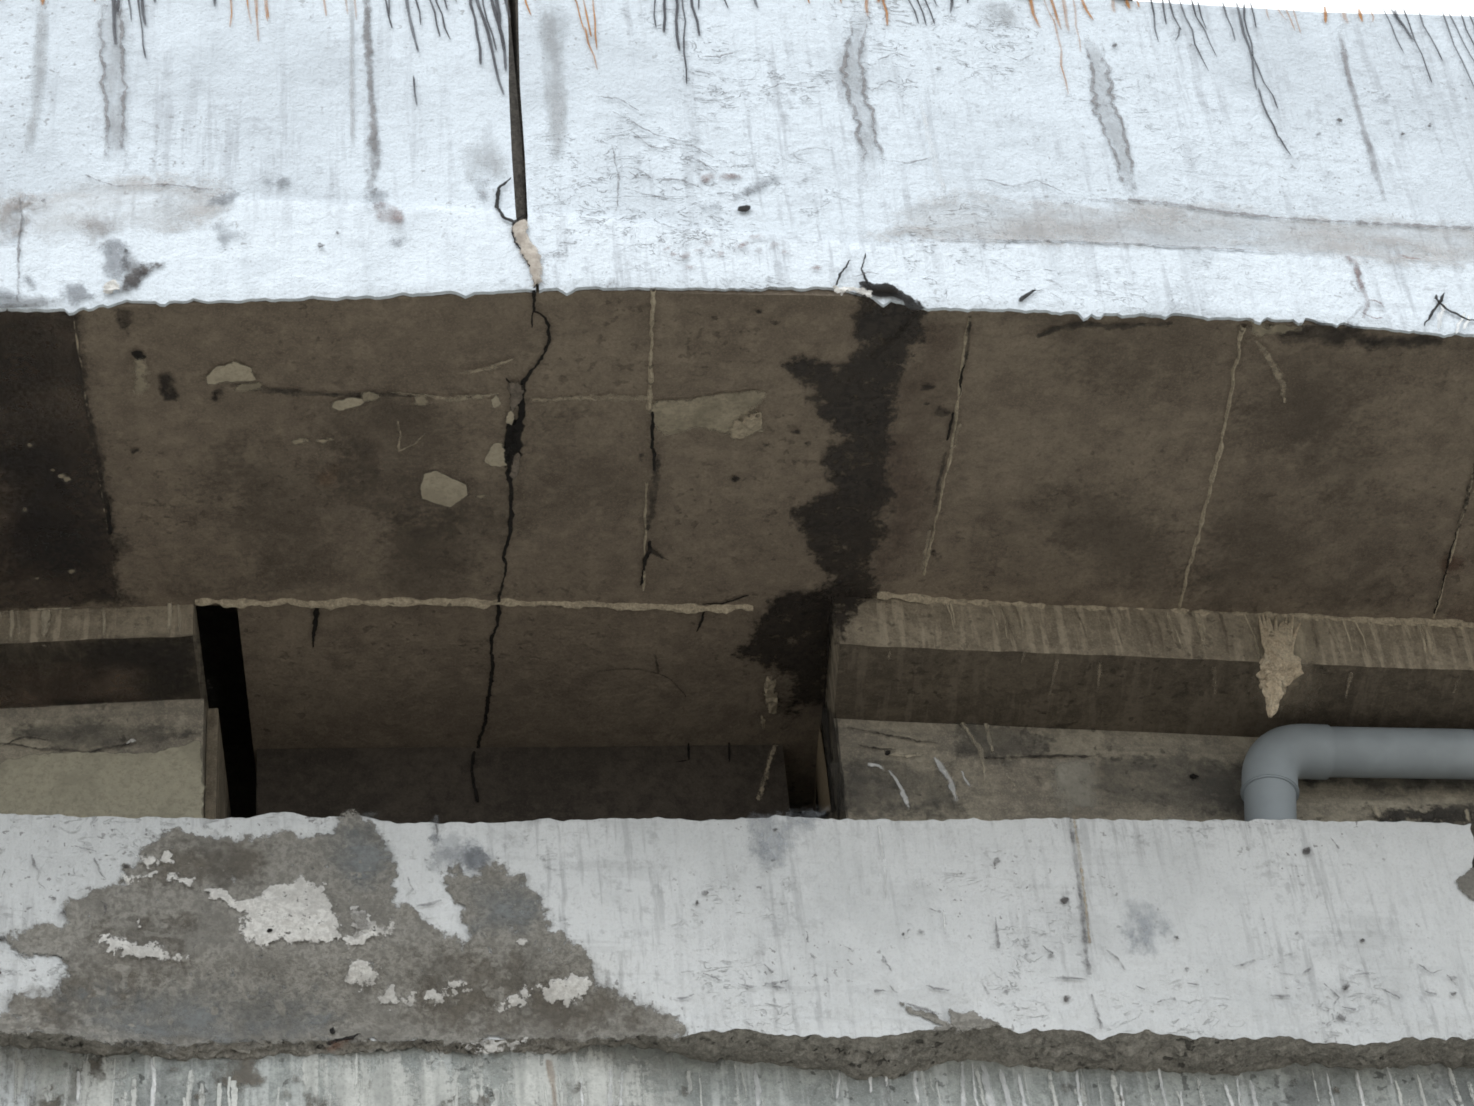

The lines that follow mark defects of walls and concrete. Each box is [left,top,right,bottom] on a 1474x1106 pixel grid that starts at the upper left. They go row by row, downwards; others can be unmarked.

corrosion [575,0,597,67]
corrosion [1029,0,1093,30]
spalling [206,362,262,401]
crack [238,177,665,803]
spalling [420,471,485,507]
damp [731,286,927,715]
spalling [1456,867,1474,900]
peeling [0,809,688,1091]
spalling [899,1002,1011,1033]
damp [0,1045,156,1106]
damp [183,1070,238,1106]
damp [293,1045,703,1106]